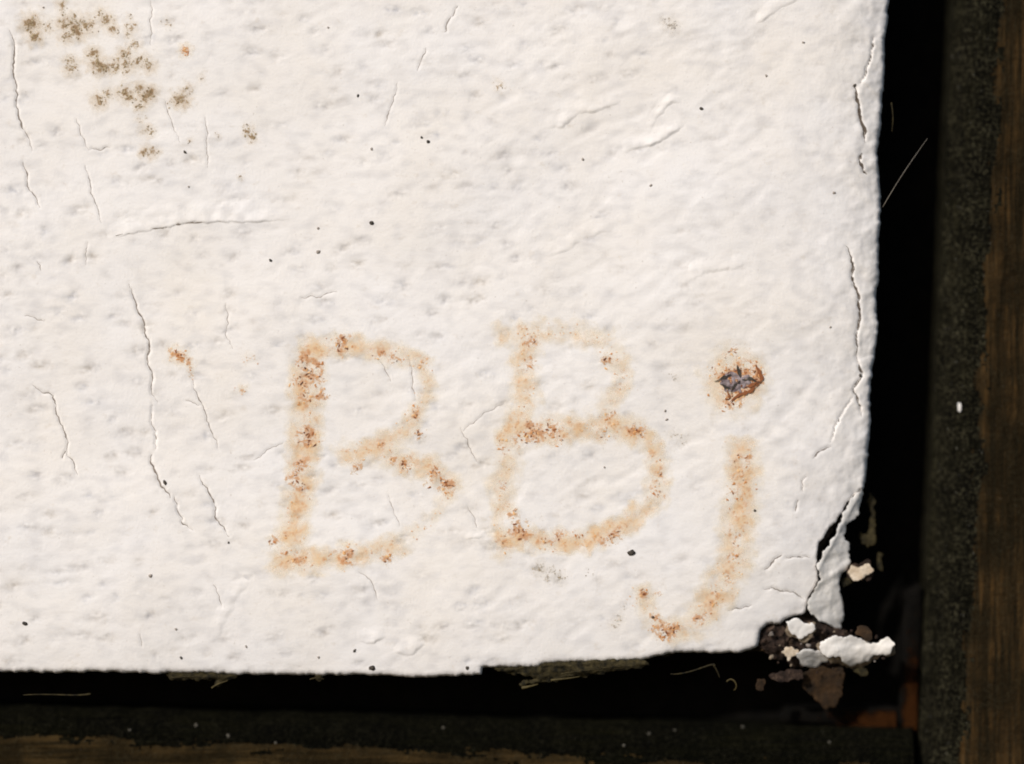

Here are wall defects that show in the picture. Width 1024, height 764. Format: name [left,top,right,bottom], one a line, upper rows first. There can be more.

water stain [23,2,159,157]
crack [854,45,874,175]
crack [131,289,188,527]
corrosion [268,334,456,572]
corrosion [494,323,665,554]
corrosion [627,444,757,642]
corrosion [707,348,766,412]
peeling [755,489,895,710]
crack [795,246,863,511]